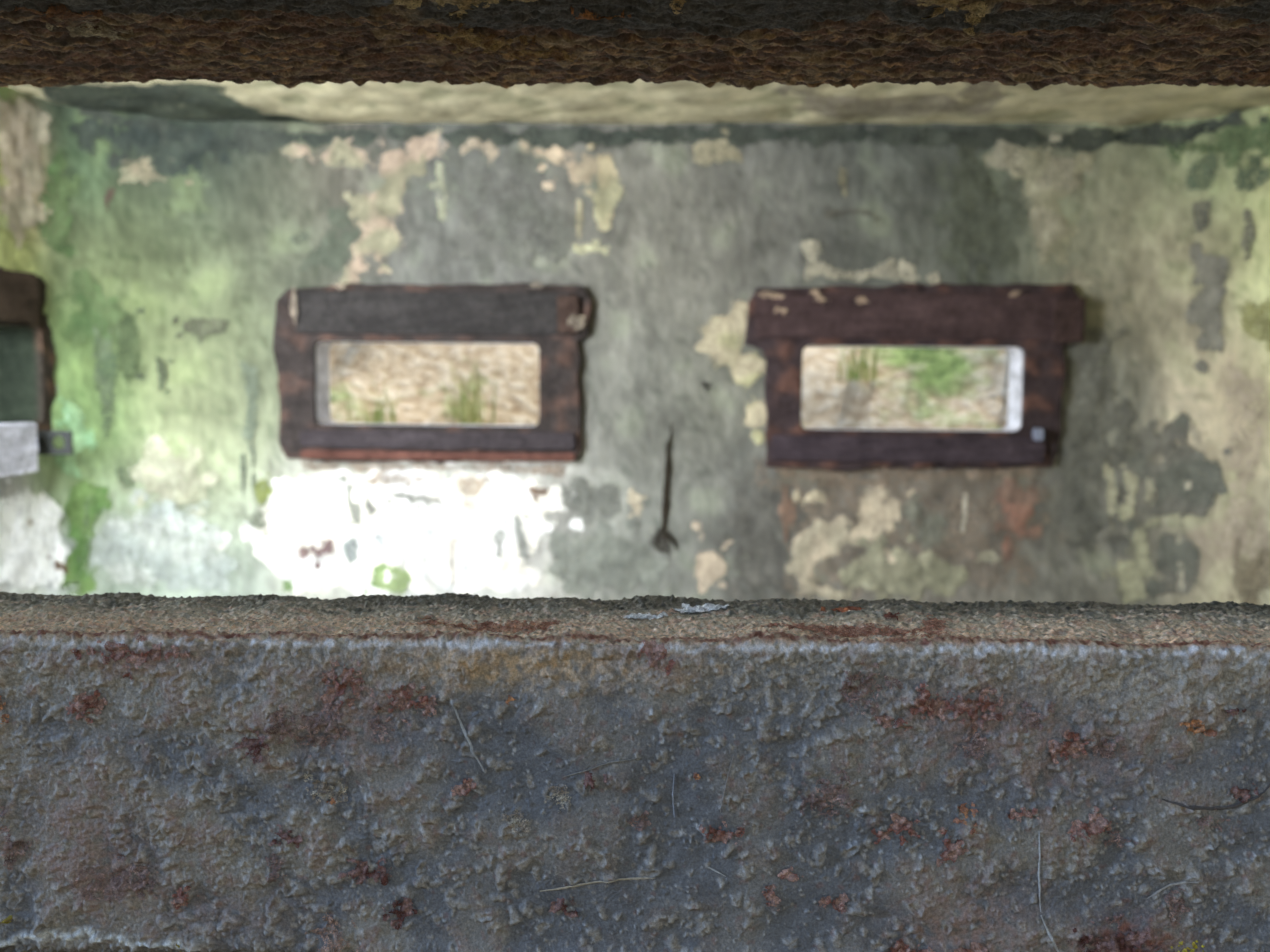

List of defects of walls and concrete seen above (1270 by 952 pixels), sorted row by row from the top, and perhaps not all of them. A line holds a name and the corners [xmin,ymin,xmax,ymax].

peeling [280,125,499,284]
peeling [518,139,625,255]
leakage [40,81,1270,285]
peeling [74,433,673,599]
peeling [785,478,1001,601]
rust [1068,914,1175,952]